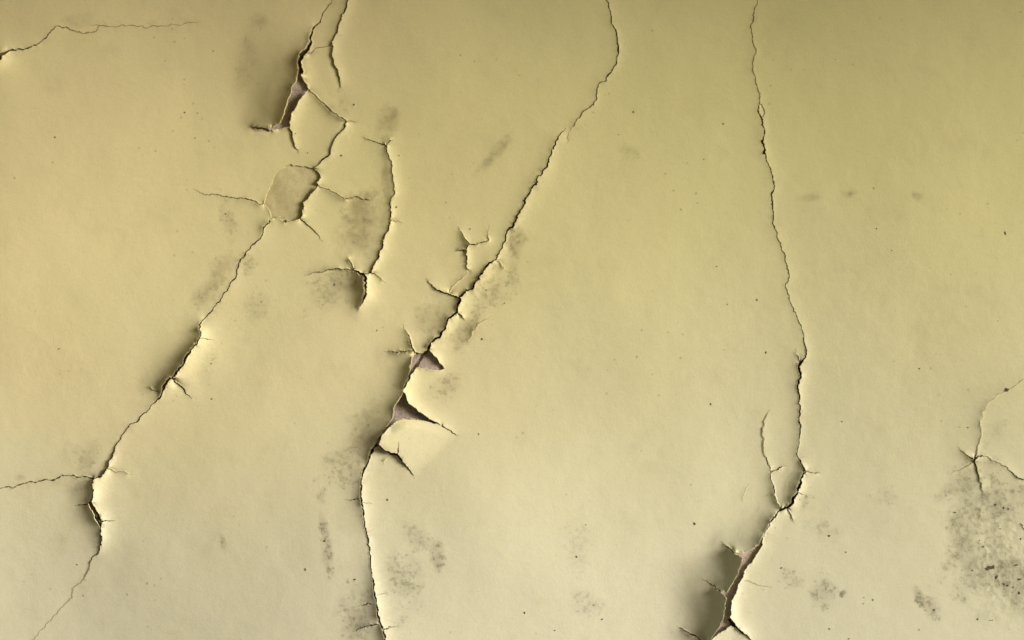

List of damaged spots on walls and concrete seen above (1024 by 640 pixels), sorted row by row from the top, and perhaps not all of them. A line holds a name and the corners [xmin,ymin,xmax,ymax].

peeling [245,0,339,152]
crack [421,0,626,350]
crack [0,0,407,640]
peeling [352,324,461,476]
crack [740,0,819,525]
crack [950,378,1024,520]
peeling [669,471,814,640]